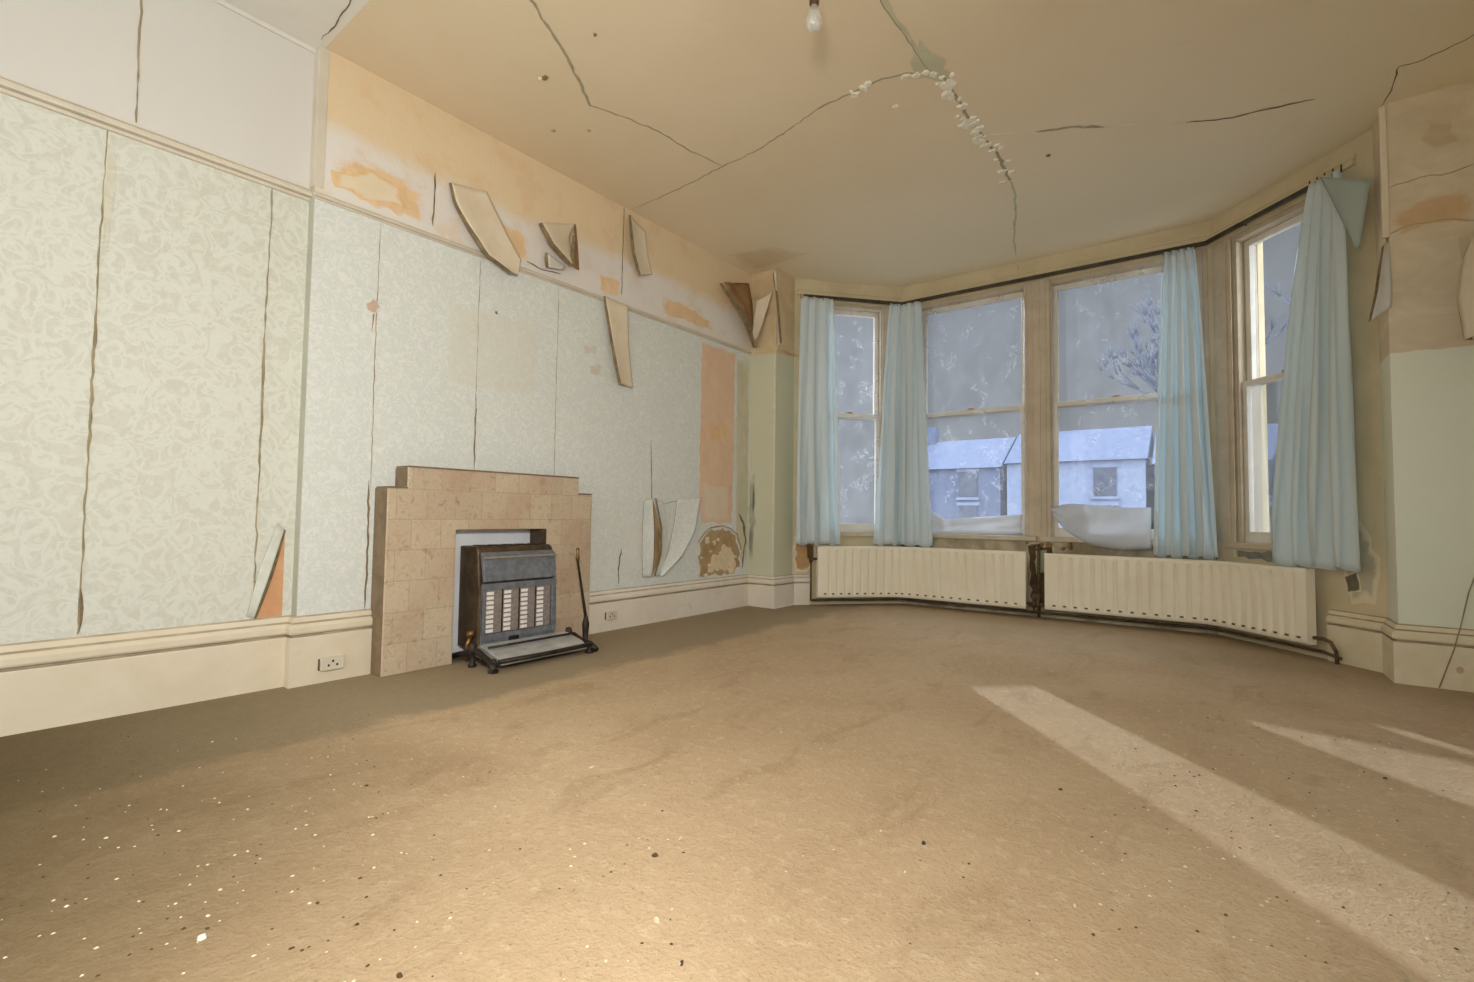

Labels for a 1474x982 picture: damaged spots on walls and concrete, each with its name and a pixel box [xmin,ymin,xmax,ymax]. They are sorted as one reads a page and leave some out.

crack [529,0,1315,269]
peeling [597,272,750,579]
peeling [247,523,286,618]